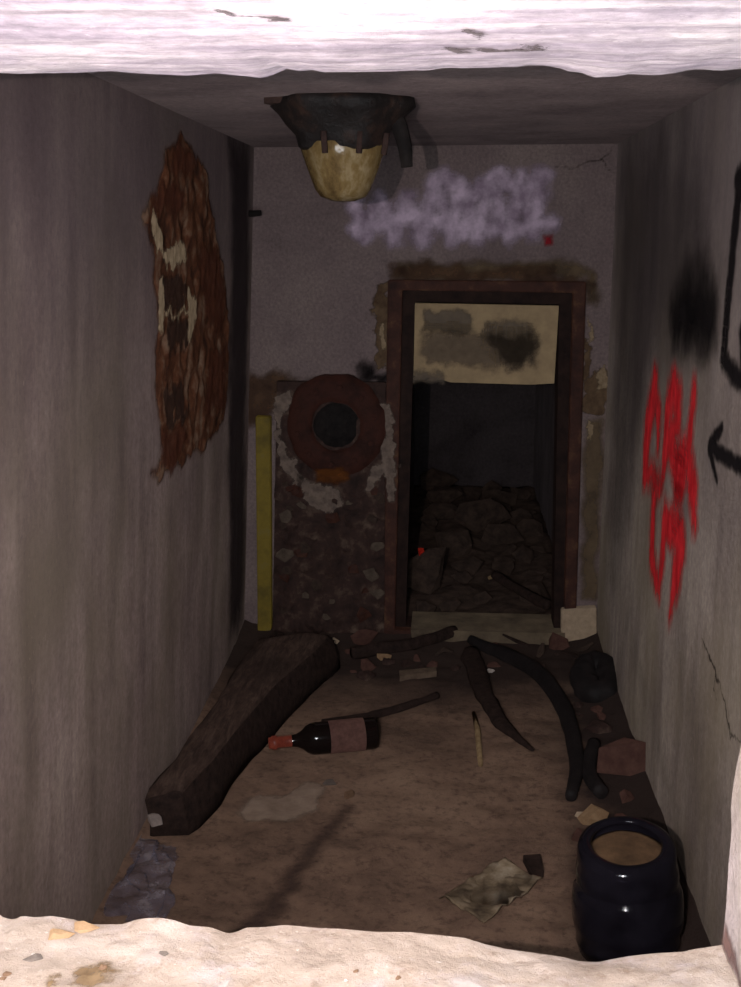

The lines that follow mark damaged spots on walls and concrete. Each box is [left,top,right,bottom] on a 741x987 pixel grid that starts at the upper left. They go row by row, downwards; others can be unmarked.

crack [703,642,739,741]